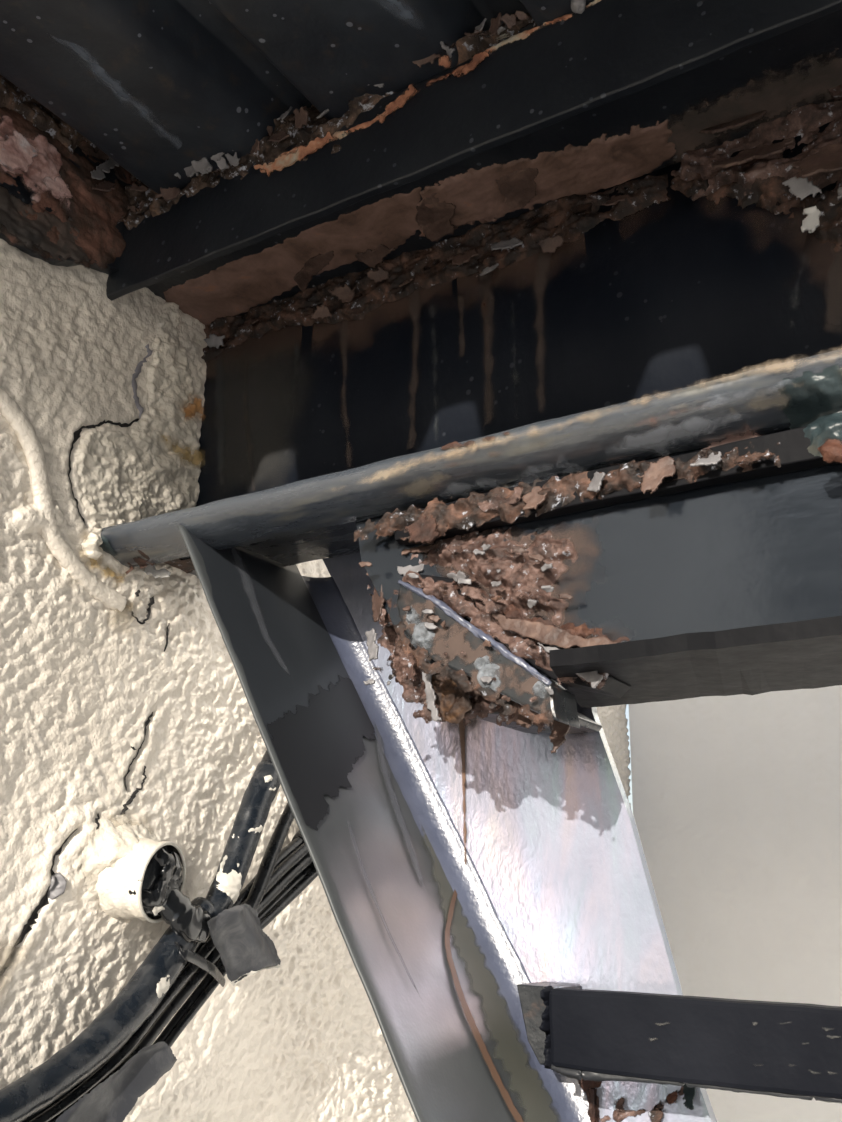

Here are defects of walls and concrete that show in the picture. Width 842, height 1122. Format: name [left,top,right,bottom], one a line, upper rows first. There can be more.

corrosion [0,74,139,269]
peeling [61,39,181,148]
peeling [440,41,455,58]
corrosion [670,84,842,330]
crack [68,344,153,526]
corrosion [428,432,509,460]
corrosion [756,355,842,463]
crack [131,590,170,652]
corrosion [354,442,781,864]
crack [0,712,153,976]
corrosion [445,890,524,1122]
corrosion [578,1078,696,1122]